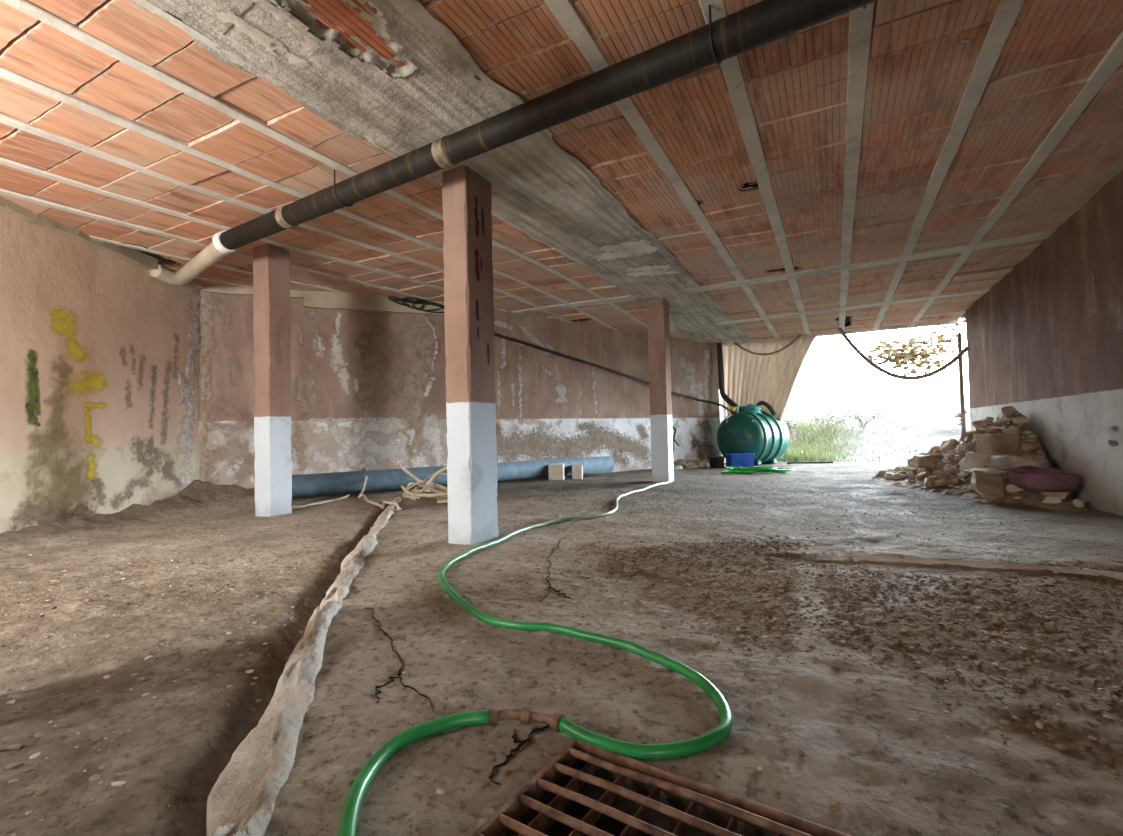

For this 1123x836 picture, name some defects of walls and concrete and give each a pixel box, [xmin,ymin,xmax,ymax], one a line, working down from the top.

spalling [275,0,418,78]
damp [26,364,87,515]
peeling [293,310,411,473]
peeling [496,421,649,466]
crack [539,536,571,602]
crack [364,607,434,712]